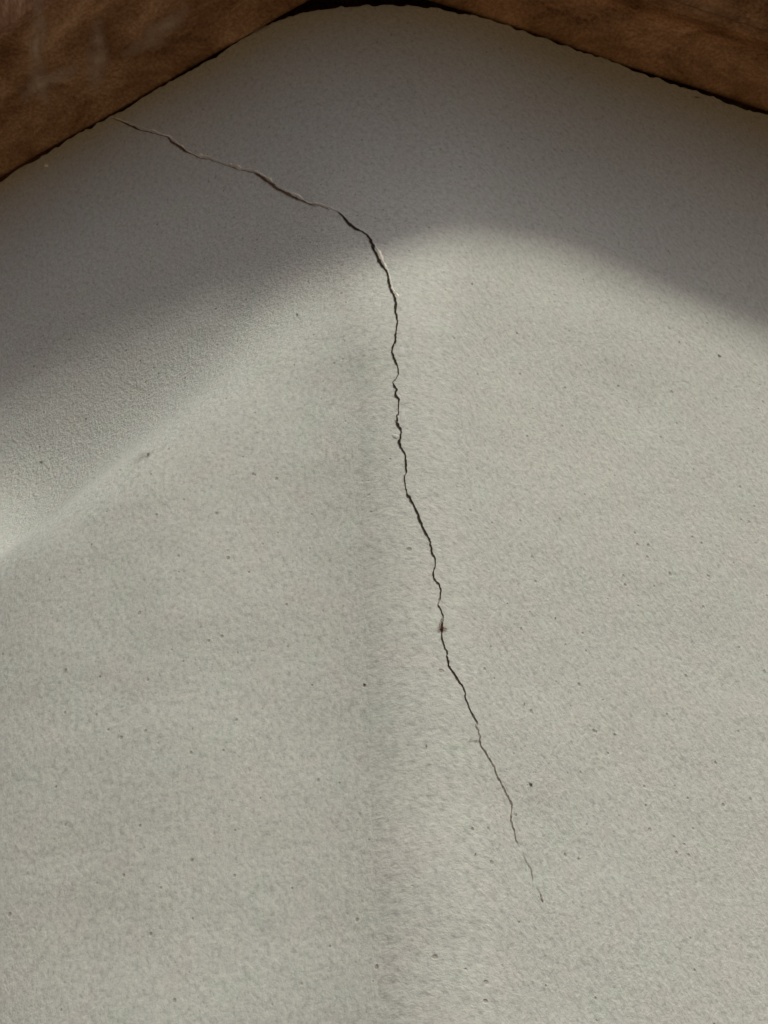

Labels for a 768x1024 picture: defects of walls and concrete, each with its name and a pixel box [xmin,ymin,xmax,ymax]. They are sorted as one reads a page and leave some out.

crack [112,117,544,902]